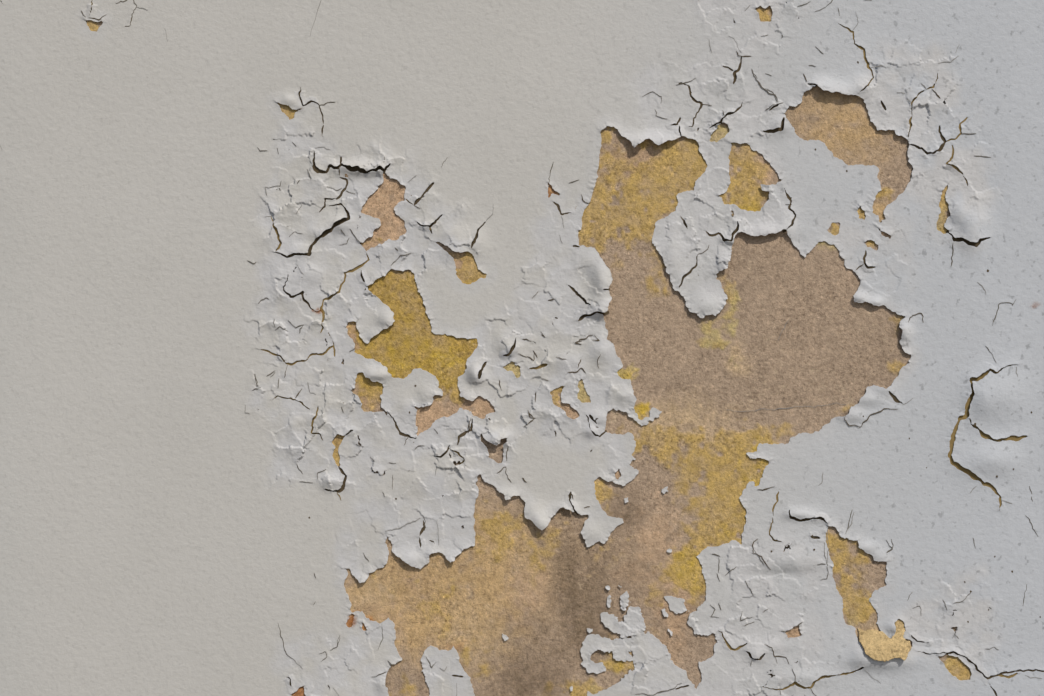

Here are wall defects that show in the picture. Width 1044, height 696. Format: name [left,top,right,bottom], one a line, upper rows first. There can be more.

crack [81,0,146,27]
peeling [276,91,303,120]
peeling [778,47,913,251]
peeling [936,183,950,234]
crack [946,231,990,266]
peeling [342,119,912,696]
crack [948,282,1038,536]
peeling [318,434,345,490]
peeling [938,654,972,680]
crack [907,592,1044,696]